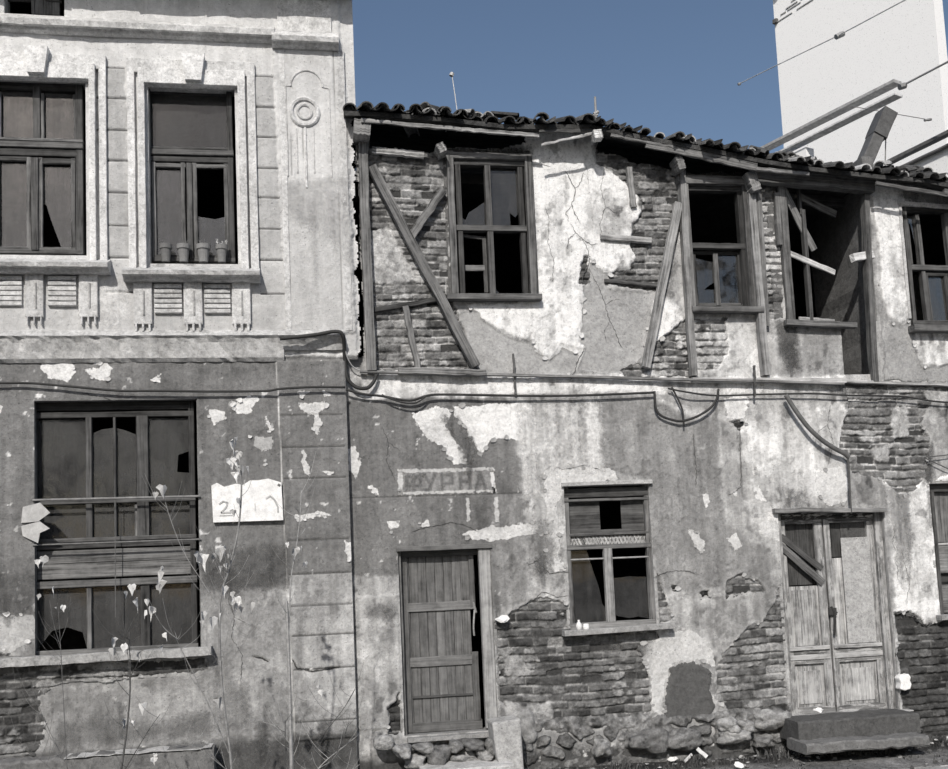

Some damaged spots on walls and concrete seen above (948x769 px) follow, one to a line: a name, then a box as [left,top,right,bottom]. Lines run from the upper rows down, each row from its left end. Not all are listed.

flaking render [354,142,729,379]